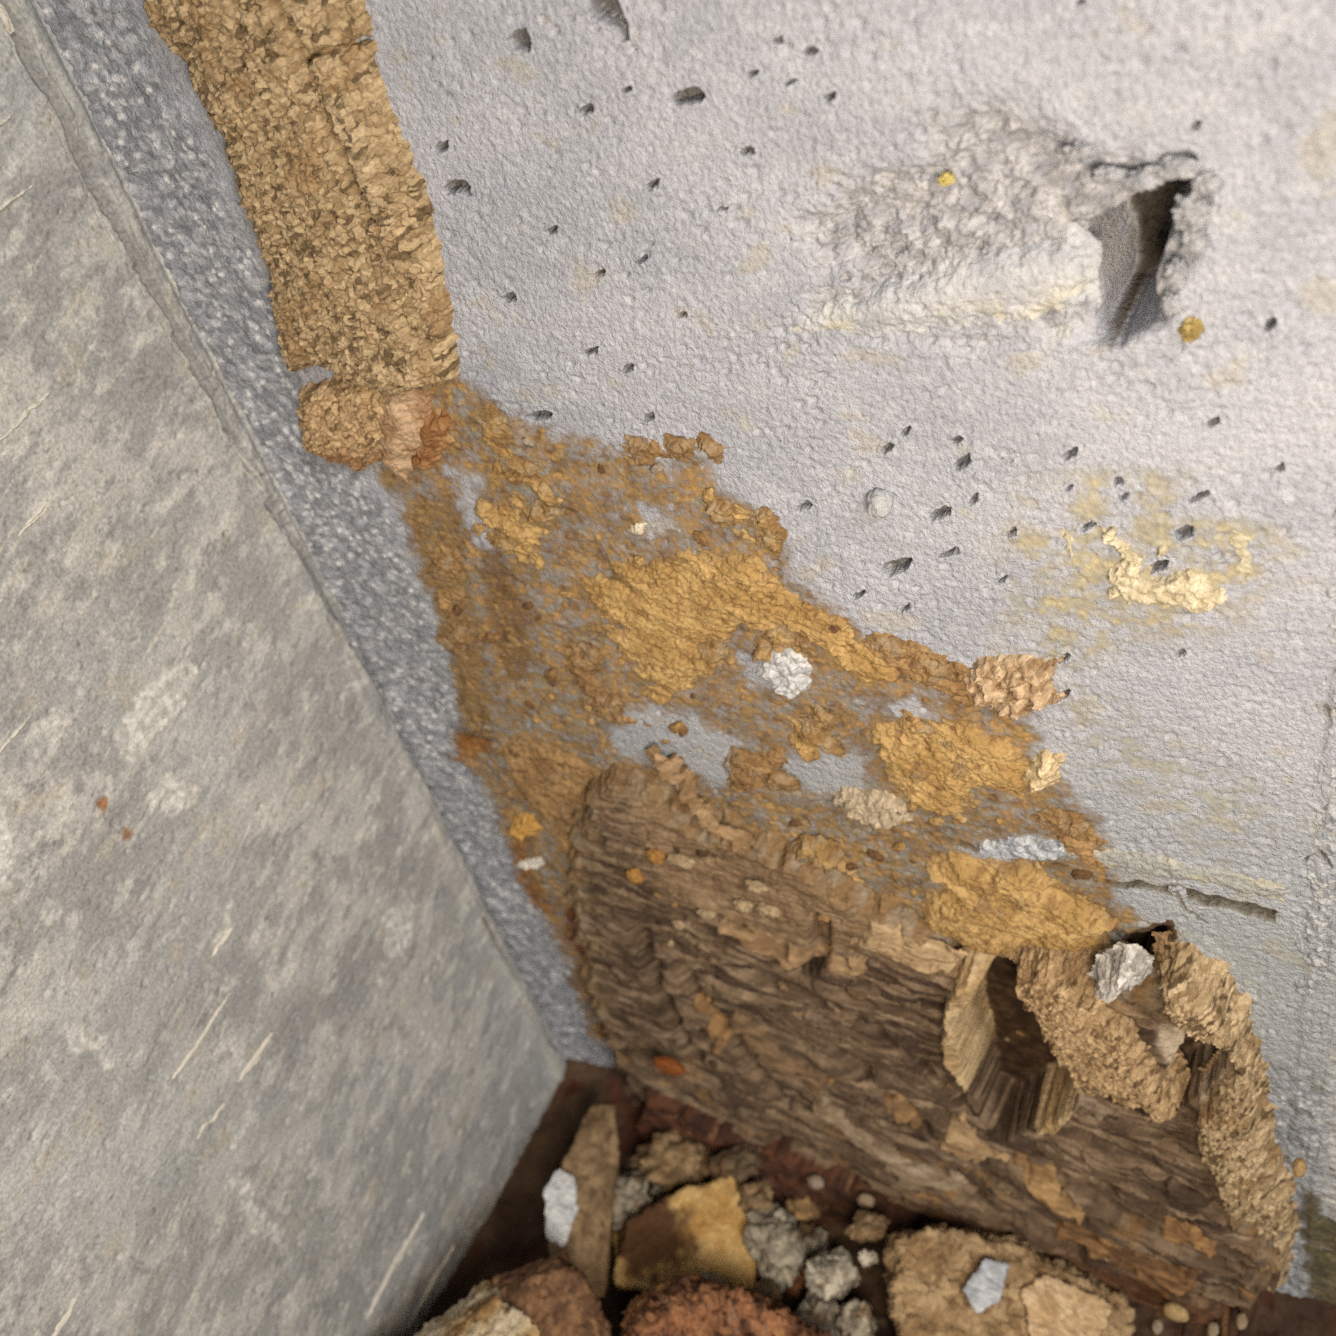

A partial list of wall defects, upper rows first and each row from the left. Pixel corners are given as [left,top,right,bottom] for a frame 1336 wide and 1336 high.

peeling [476,402,547,486]
peeling [620,432,724,464]
spalling [628,522,647,535]
peeling [704,497,788,559]
peeling [434,624,479,650]
peeling [862,635,953,689]
spalling [753,624,847,758]
peeling [727,745,801,792]
spalling [978,808,1093,862]
spalling [514,856,544,870]
crack [910,820,1290,925]
spalling [1087,919,1179,1003]